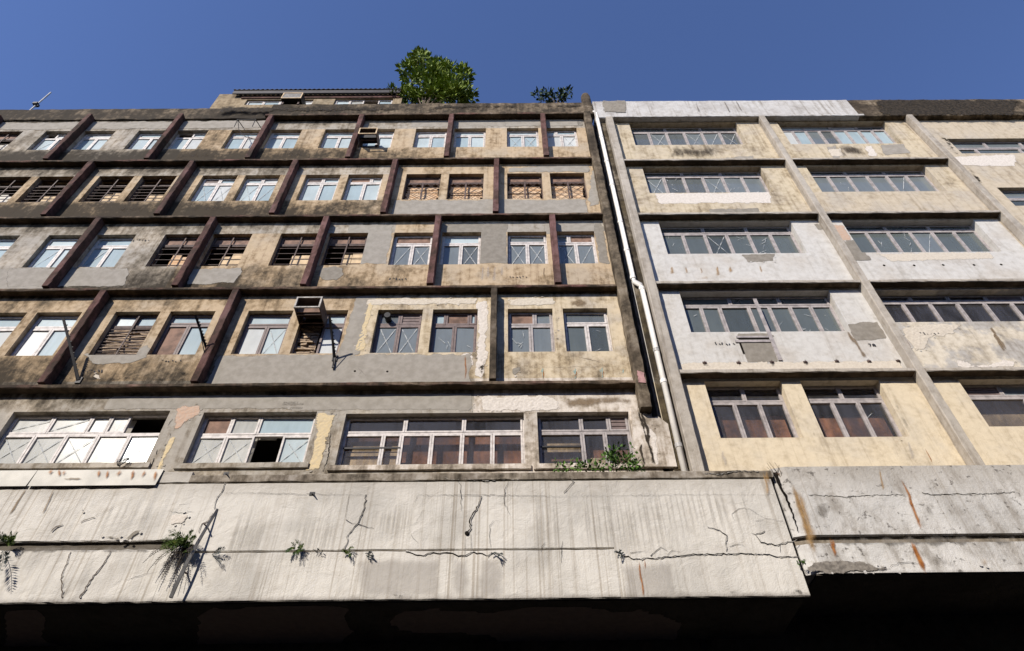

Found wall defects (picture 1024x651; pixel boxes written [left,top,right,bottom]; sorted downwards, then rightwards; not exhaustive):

peeling [903,323,960,351]
peeling [156,403,203,469]
peeling [306,412,336,472]
crack [171,482,372,549]
crack [406,470,1014,561]
corrosion [794,491,812,544]
crack [60,551,157,598]